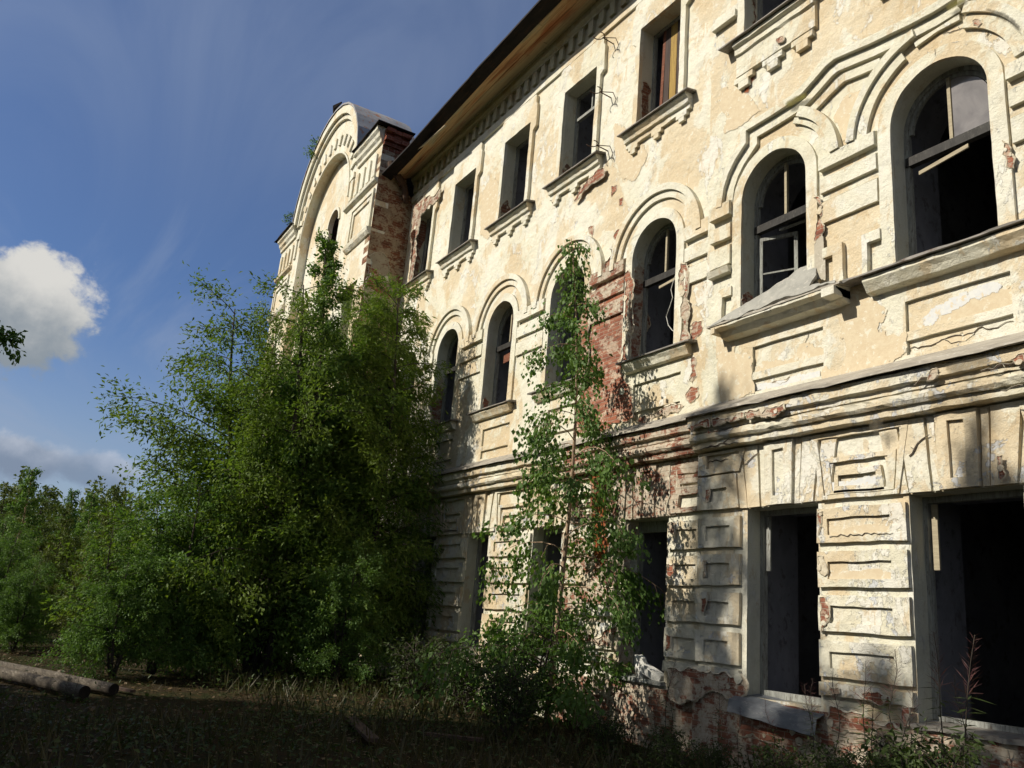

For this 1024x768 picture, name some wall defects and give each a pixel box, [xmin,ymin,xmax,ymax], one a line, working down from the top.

flaking render [640,81,652,118]
peeling [574,123,647,206]
flaking render [1002,140,1016,169]
peeling [813,196,826,280]
flaking render [576,262,703,437]
crack [911,321,1009,348]
flaking render [689,402,785,434]
flaking render [667,666,749,705]
flaking render [736,716,816,755]